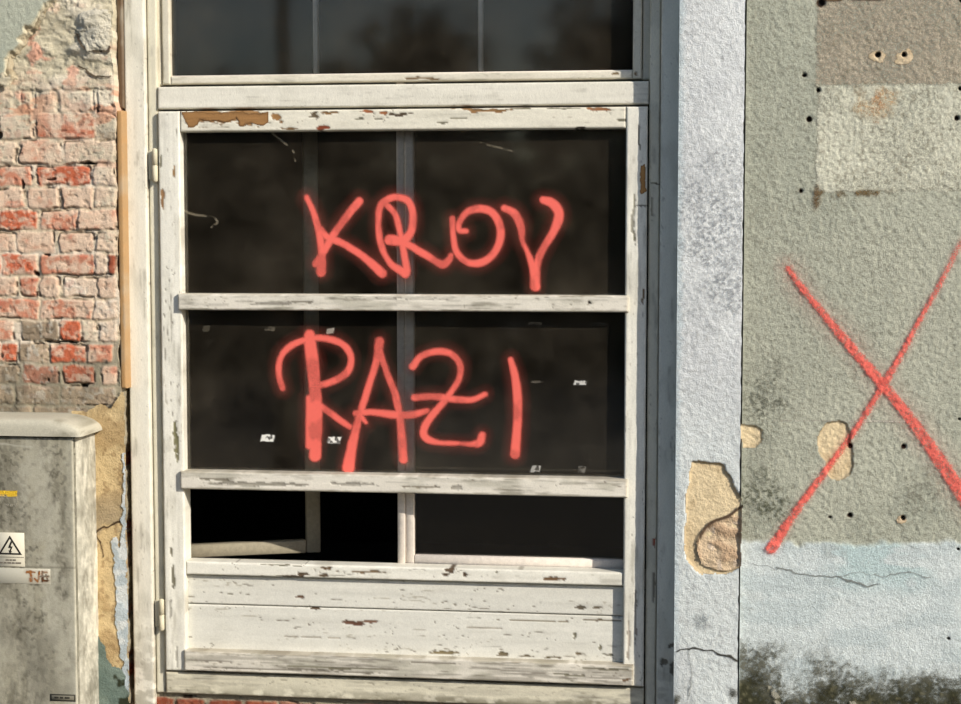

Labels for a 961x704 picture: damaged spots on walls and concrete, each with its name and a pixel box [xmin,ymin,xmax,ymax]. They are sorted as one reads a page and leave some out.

flaking render [0,0,57,87]
peeling [182,111,268,127]
flaking render [740,424,763,448]
flaking render [817,420,854,481]
flaking render [72,392,130,704]
flaking render [684,460,743,575]
crack [752,563,929,587]
water stain [730,643,961,704]